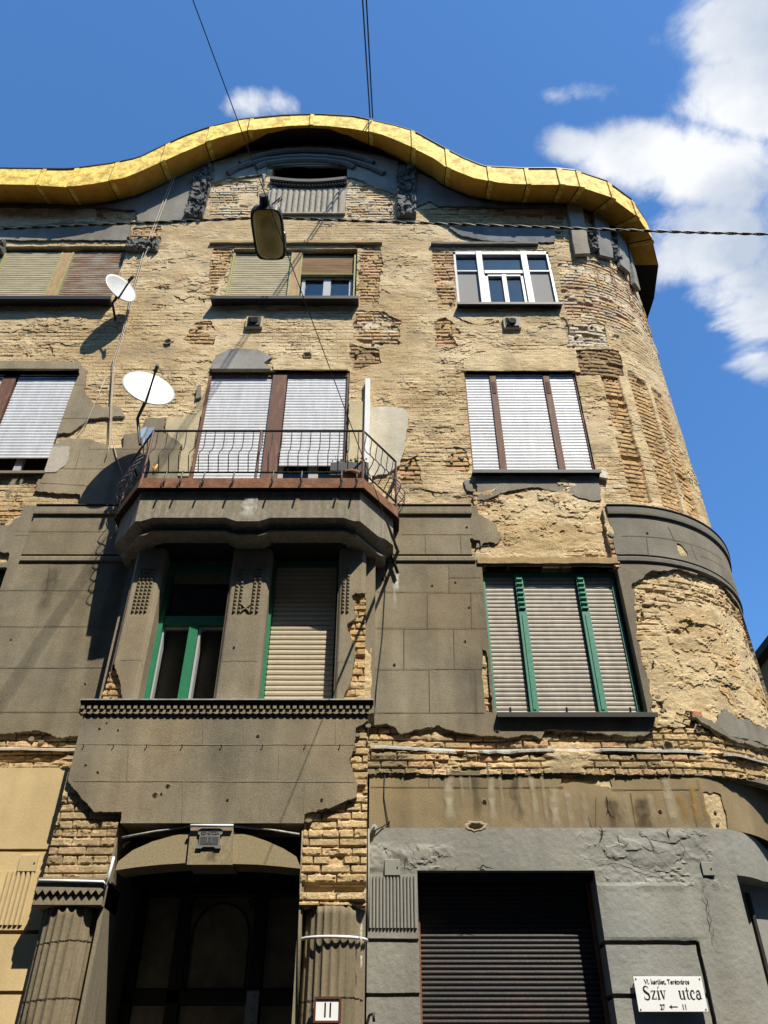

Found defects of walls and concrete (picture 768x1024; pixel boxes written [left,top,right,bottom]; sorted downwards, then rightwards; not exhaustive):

flaking render [164,321,219,346]
flaking render [349,245,401,370]
flaking render [555,253,651,380]
flaking render [472,479,620,571]
flaking render [299,570,768,907]
flaking render [0,732,121,878]
damp [444,778,462,817]
damp [529,777,572,824]
damp [663,779,699,818]